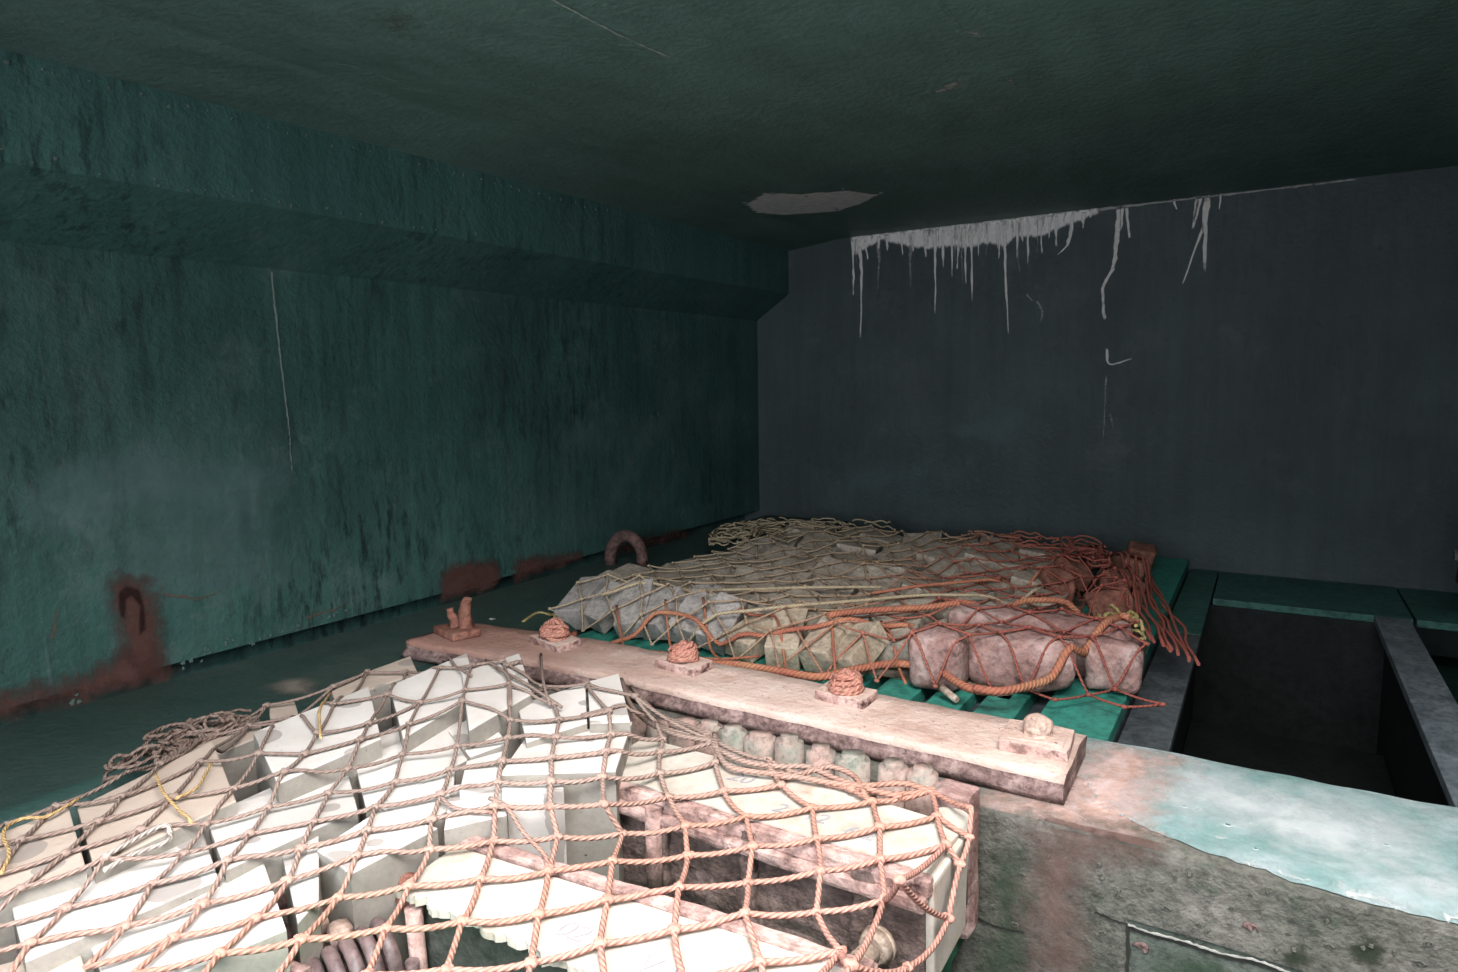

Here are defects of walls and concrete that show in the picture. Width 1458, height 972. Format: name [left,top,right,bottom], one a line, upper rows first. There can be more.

efflorescence [851,208,1098,333]
efflorescence [1101,206,1130,319]
corrosion [442,552,581,600]
corrosion [0,578,163,714]